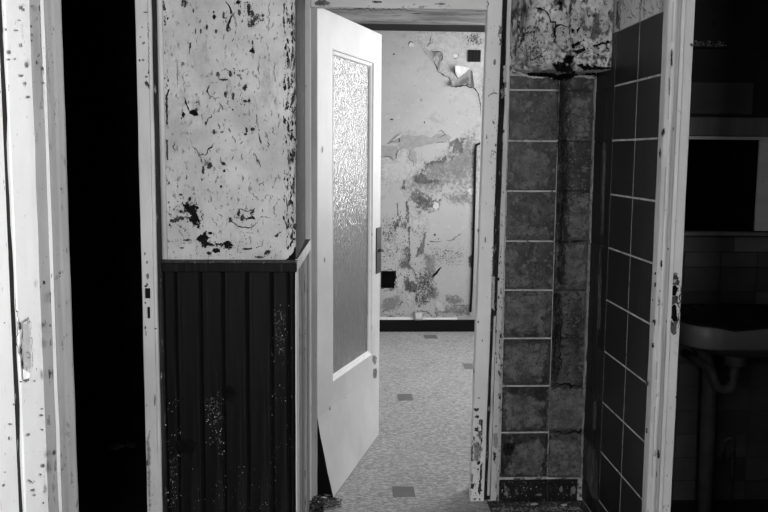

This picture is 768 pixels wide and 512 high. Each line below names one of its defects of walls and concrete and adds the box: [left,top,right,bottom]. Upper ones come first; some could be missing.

peeling [167,0,296,260]
spalling [481,22,612,103]
crack [536,3,574,43]
water stain [381,134,478,317]
peeling [472,228,502,410]
crack [552,82,602,485]
peeling [470,397,483,500]